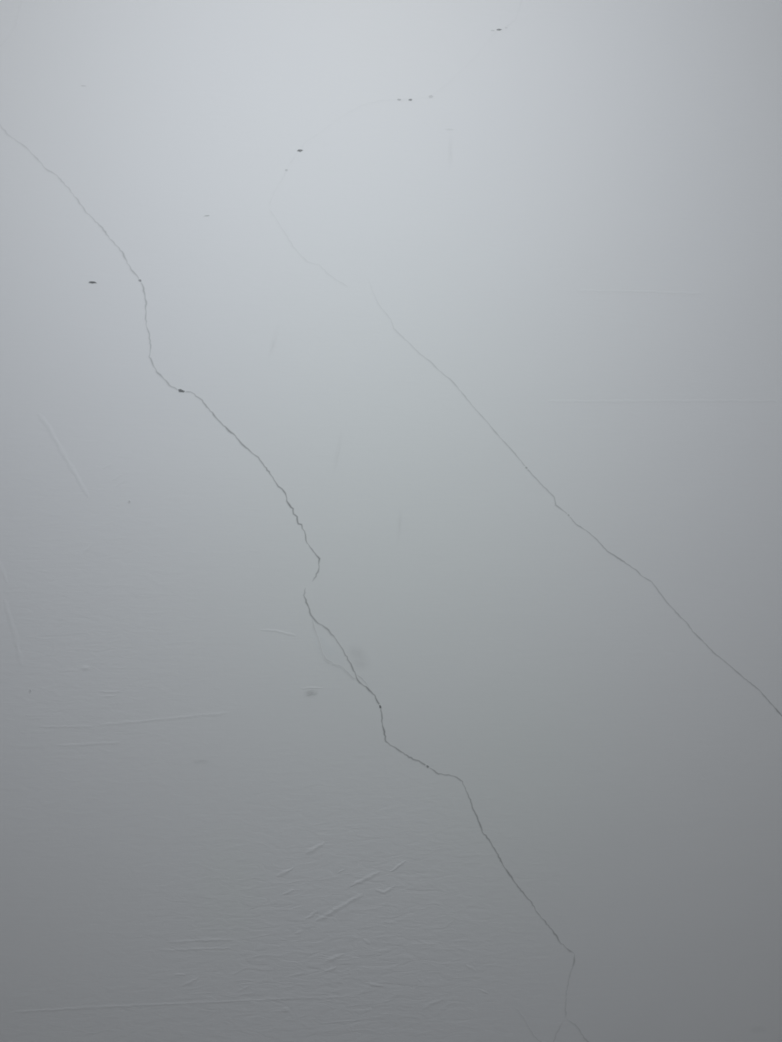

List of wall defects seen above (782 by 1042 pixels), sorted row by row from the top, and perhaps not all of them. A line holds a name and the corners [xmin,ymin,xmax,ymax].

crack [0,123,590,1042]
crack [268,208,782,717]